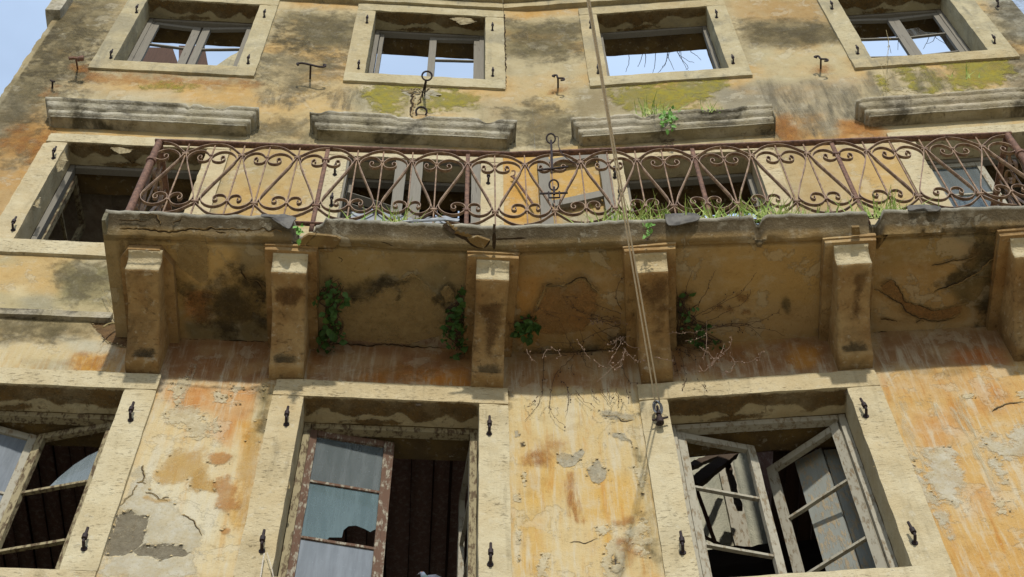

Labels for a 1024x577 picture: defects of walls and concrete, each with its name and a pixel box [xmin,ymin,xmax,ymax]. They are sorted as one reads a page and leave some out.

water stain [991,0,1024,57]
water stain [0,2,108,137]
crack [874,256,994,333]
peeling [161,376,222,440]
flaking render [99,452,239,577]
peeling [556,448,610,484]
flaking render [594,510,653,577]
peeling [906,446,965,539]
peeling [979,425,1024,484]